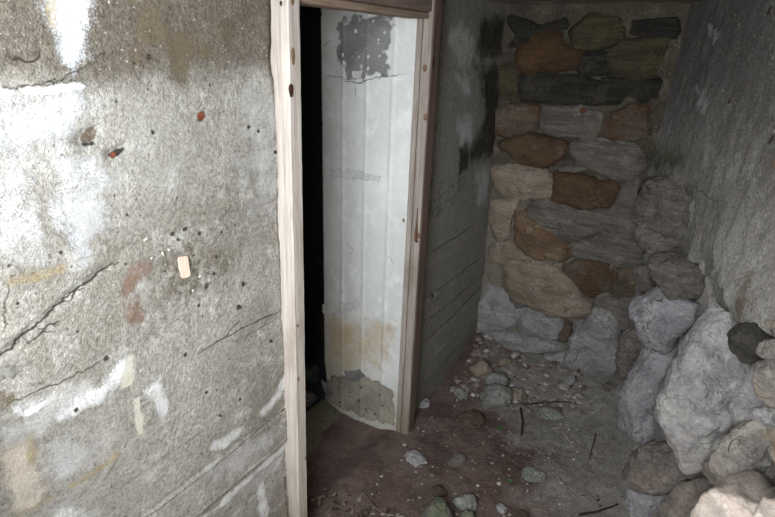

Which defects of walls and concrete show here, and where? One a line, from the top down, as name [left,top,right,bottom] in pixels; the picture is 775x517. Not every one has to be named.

peeling [335,13,397,81]
water stain [446,11,506,211]
crack [0,262,119,356]
crack [1,359,104,406]
spalling [321,369,395,425]